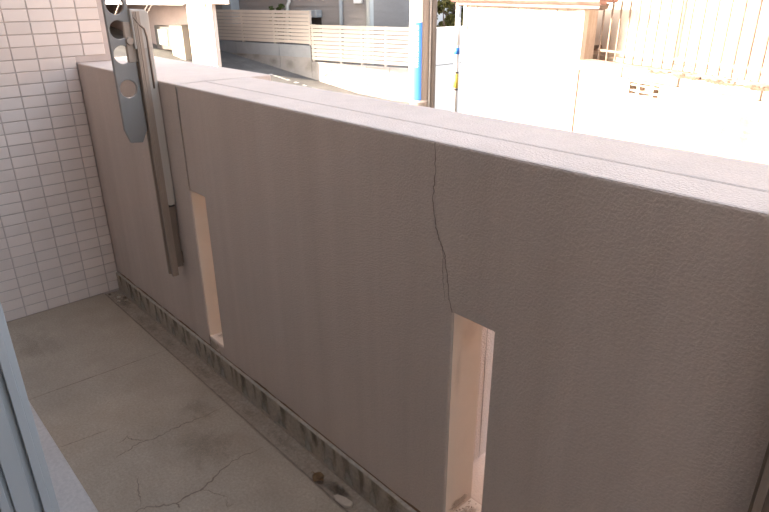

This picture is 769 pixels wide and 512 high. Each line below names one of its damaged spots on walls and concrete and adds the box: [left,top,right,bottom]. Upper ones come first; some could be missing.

crack [432,149,452,311]
crack [136,447,262,512]